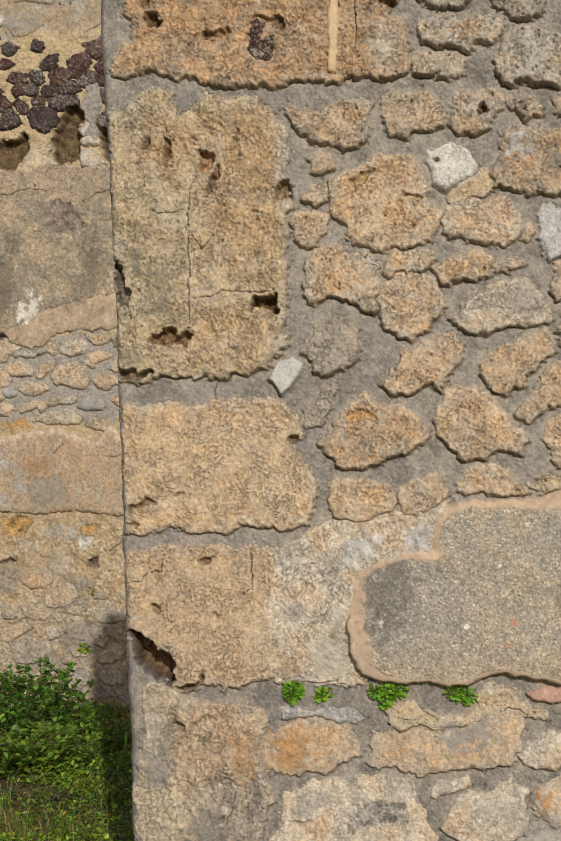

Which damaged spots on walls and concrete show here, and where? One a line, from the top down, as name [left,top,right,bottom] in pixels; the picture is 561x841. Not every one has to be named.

crack [0,184,46,198]
crack [82,186,110,202]
spalling [126,628,205,692]